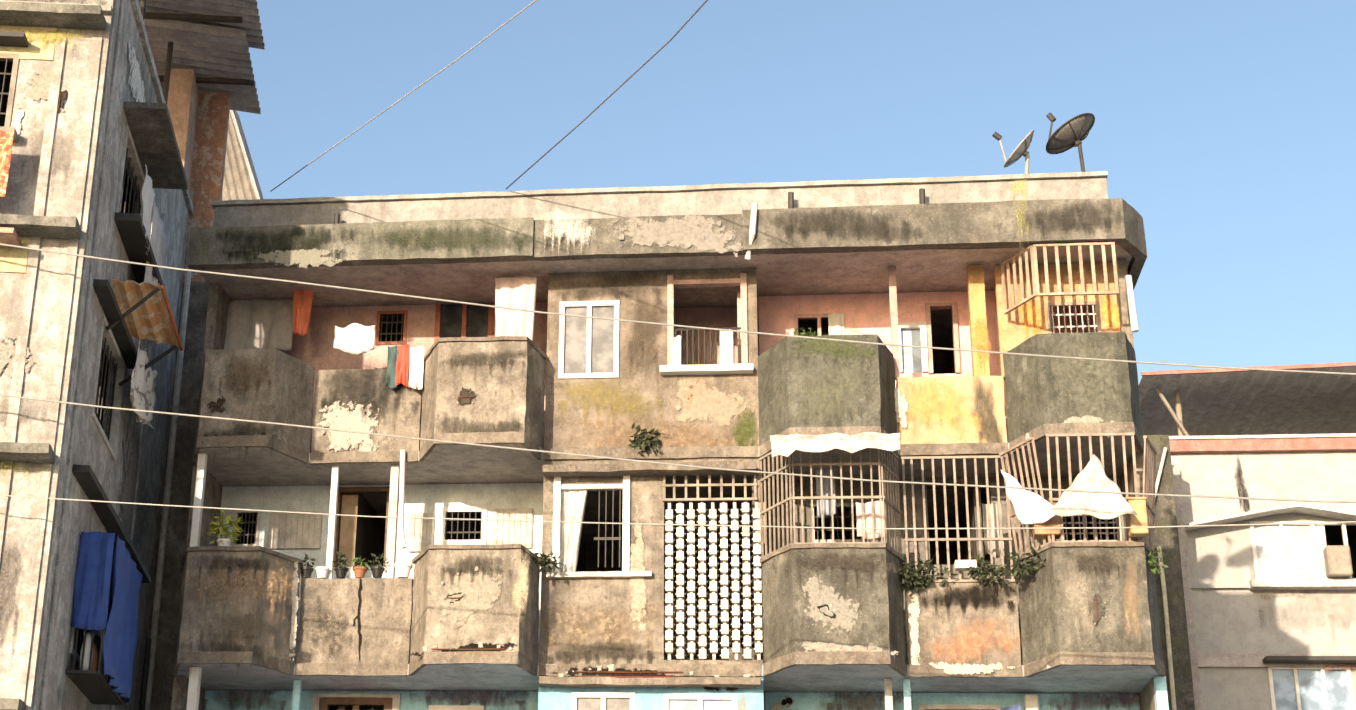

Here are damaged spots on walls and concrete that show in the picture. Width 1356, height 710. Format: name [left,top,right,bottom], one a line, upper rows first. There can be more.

water stain [384,228,543,250]
peeling [544,211,591,246]
peeling [607,213,747,257]
water stain [775,210,920,239]
peeling [315,400,379,452]
water stain [973,381,1002,443]
crack [353,578,362,660]
peeling [800,575,1015,675]
water stain [920,585,1014,612]